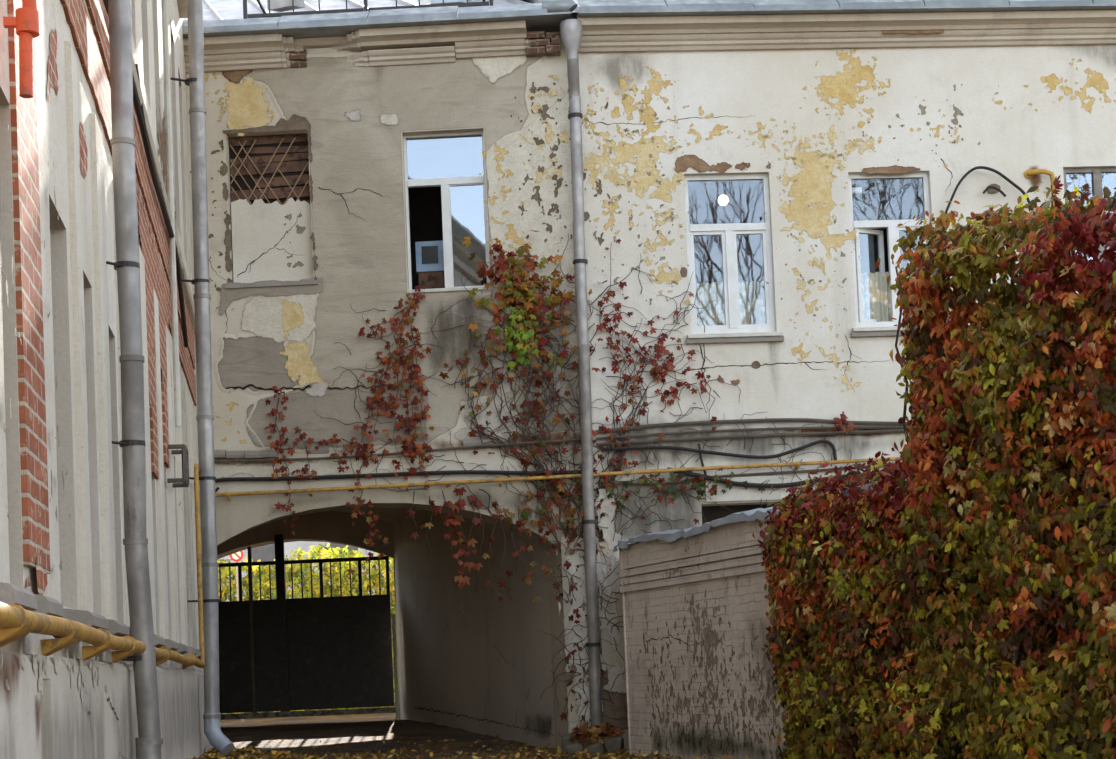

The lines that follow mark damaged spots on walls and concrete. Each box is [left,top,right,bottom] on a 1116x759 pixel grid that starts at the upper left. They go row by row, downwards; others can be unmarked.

spalling [47,28,58,101]
peeling [1040,58,1116,113]
spalling [79,122,88,179]
crack [318,187,383,221]
crack [209,211,301,334]
flaking render [204,49,964,482]
crack [226,384,389,395]
crack [684,335,888,413]
peeling [519,483,787,759]